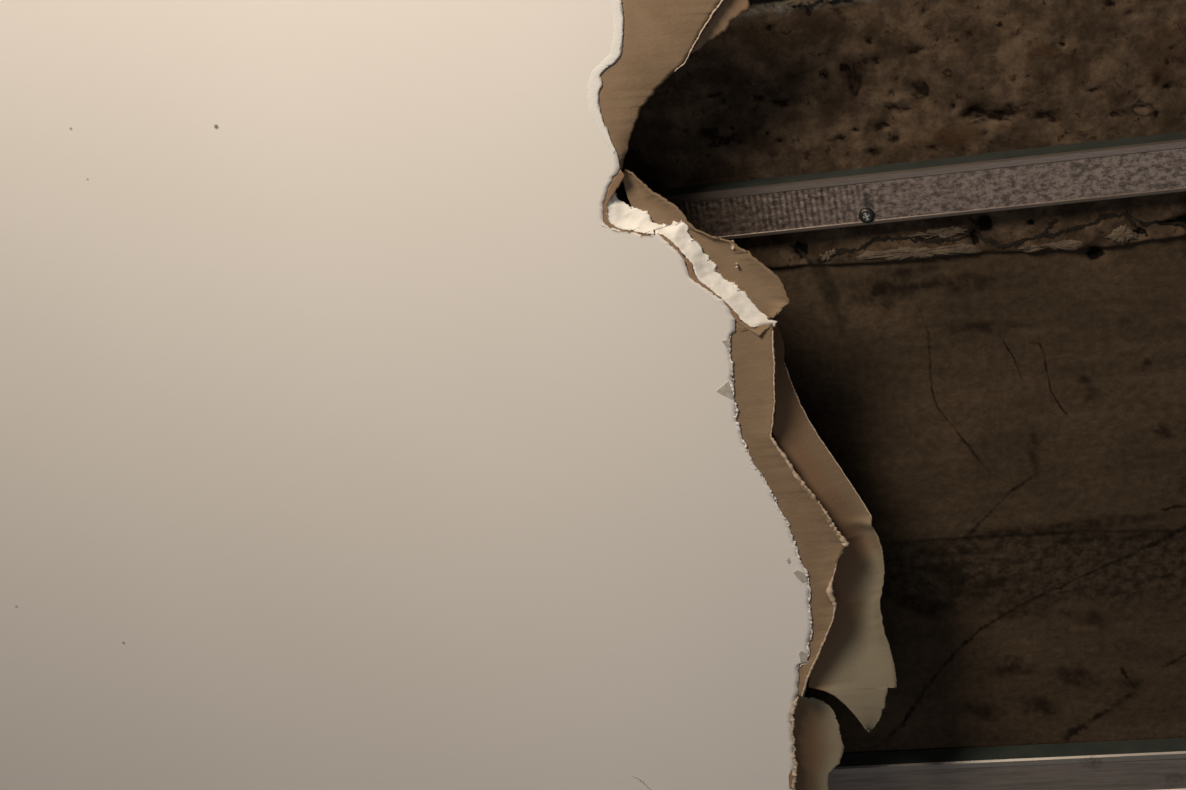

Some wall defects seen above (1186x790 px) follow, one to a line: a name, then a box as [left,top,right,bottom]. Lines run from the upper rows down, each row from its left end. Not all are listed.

spalling [951,103,1027,122]
spalling [789,211,1186,264]